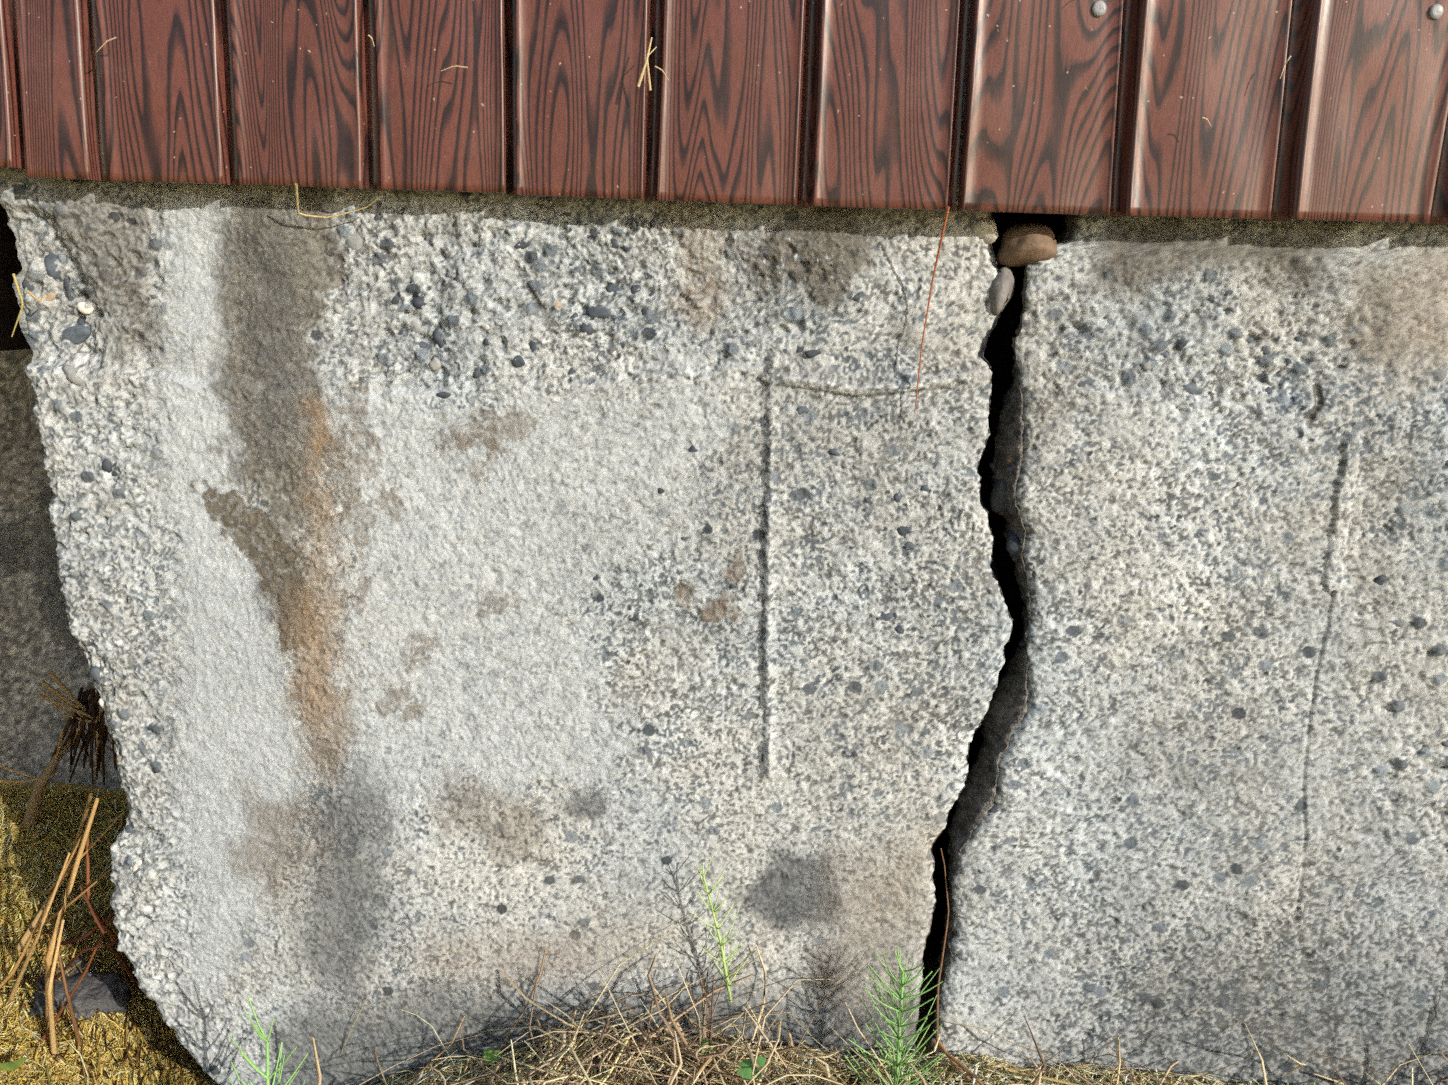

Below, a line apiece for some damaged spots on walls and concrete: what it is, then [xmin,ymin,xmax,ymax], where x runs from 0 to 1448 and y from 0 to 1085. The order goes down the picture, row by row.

water stain [158,188,351,989]
water stain [752,860,840,925]
crack [914,212,1077,1059]